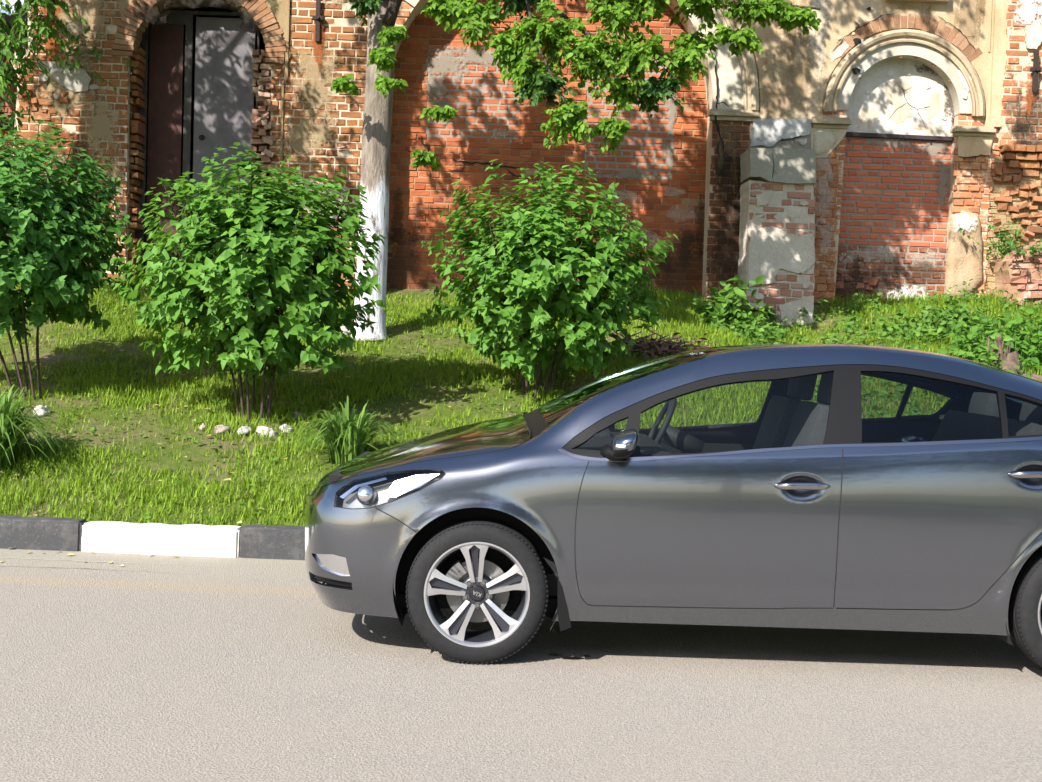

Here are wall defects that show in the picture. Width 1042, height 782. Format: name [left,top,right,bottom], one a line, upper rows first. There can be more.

peeling [19,61,99,121]
crack [421,138,522,177]
peeling [750,118,811,147]
water stain [1006,89,1042,157]
spalling [992,167,1042,246]
peeling [747,201,815,326]